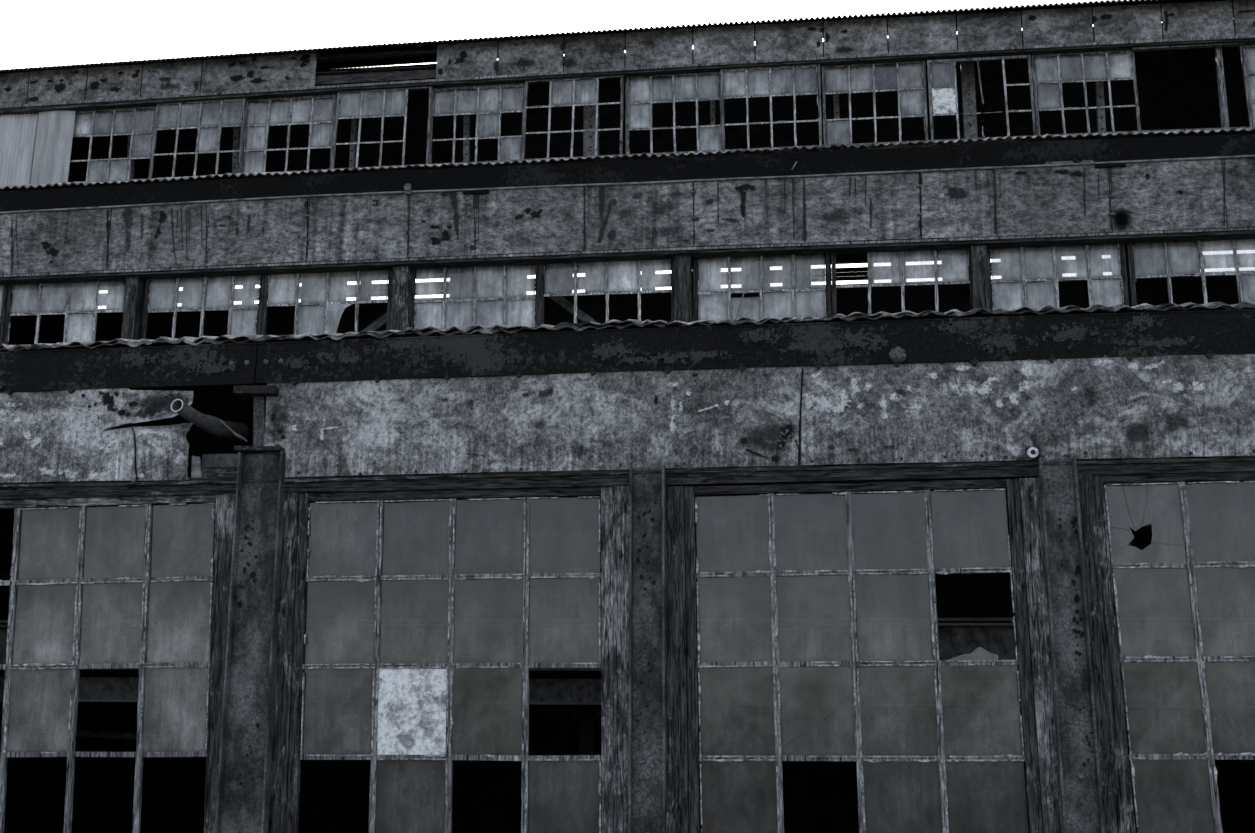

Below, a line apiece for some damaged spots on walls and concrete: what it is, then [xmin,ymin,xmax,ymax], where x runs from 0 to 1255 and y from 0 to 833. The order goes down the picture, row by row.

leakage [122,208,143,251]
leakage [171,207,202,261]
leakage [441,191,459,240]
leakage [597,186,642,243]
leakage [654,192,681,235]
leakage [822,177,872,228]
peeling [928,317,1101,407]
peeling [1116,311,1214,400]
peeling [0,402,42,447]
peeling [65,435,122,455]
peeling [39,468,103,481]